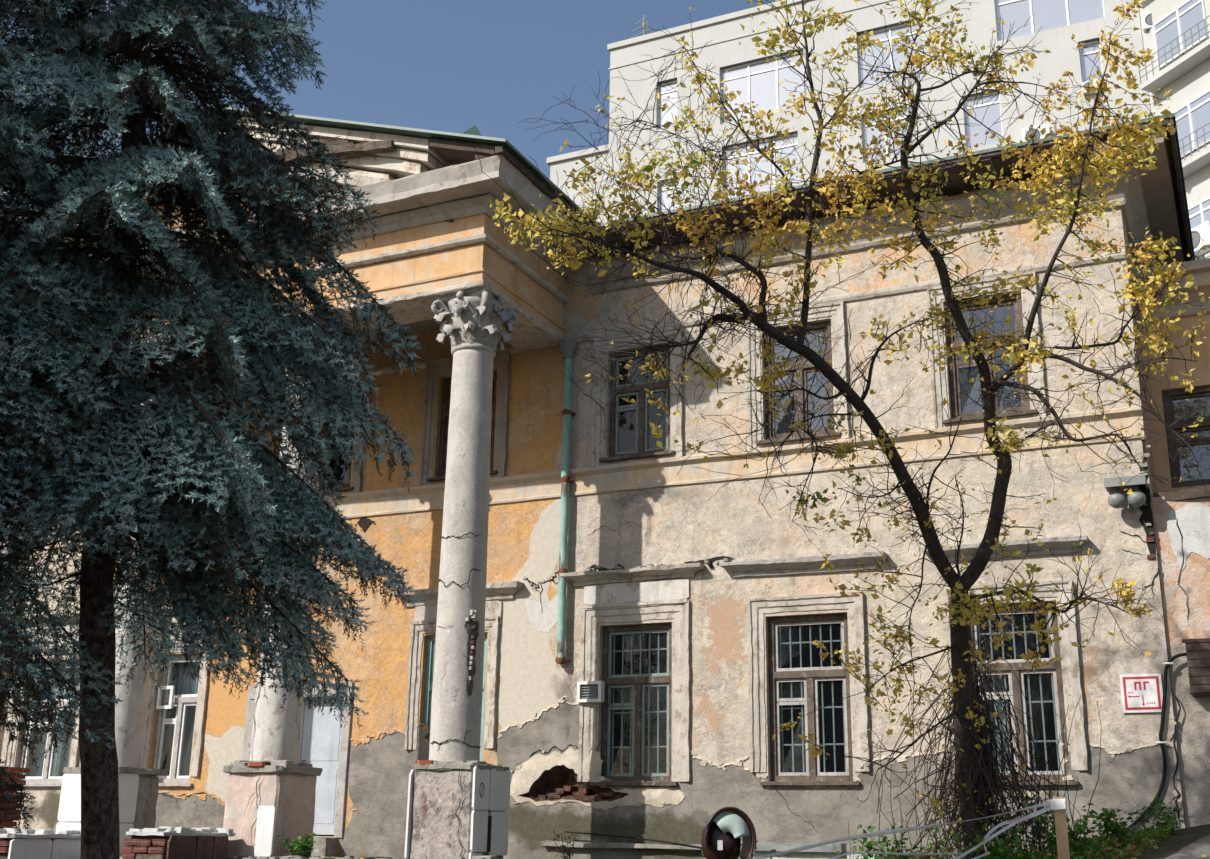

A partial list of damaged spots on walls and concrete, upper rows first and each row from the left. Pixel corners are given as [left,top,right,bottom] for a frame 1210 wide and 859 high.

flaking render [155,572,254,832]
crack [431,730,481,855]
crack [438,568,480,593]
flaking render [495,496,964,859]
flaking render [986,645,1182,853]
crack [1120,402,1189,620]
spalling [1167,502,1210,570]